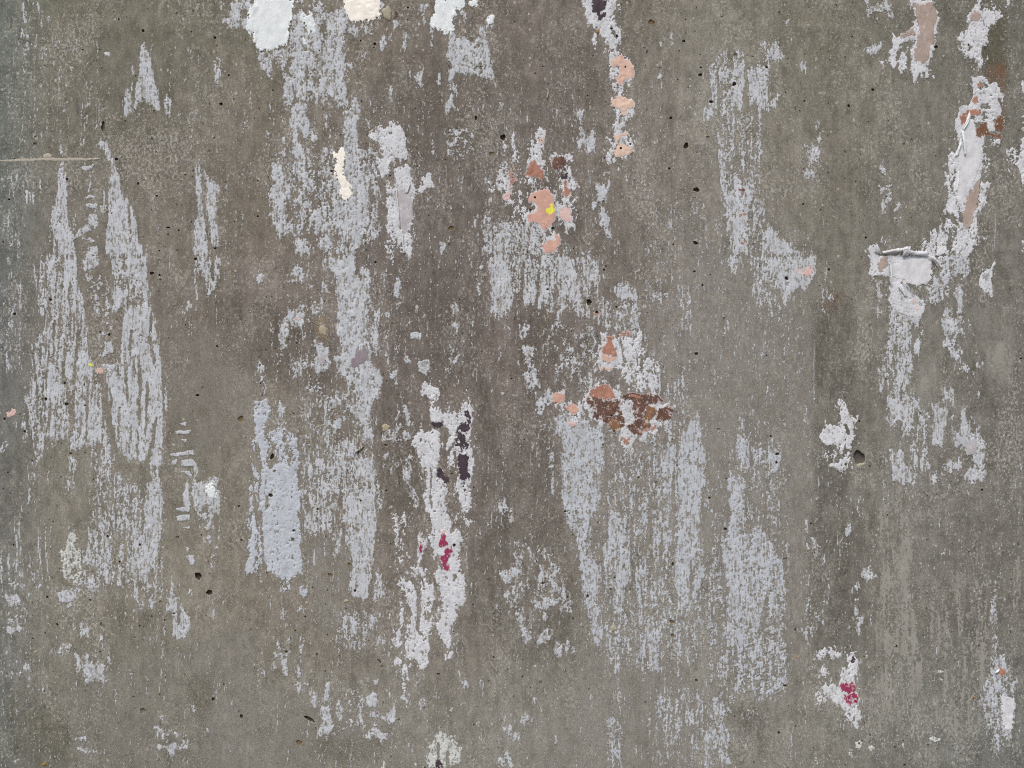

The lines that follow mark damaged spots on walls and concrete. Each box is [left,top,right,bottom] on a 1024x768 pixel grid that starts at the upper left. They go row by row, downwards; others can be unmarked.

peeling [0,0,269,768]
peeling [219,0,1024,768]